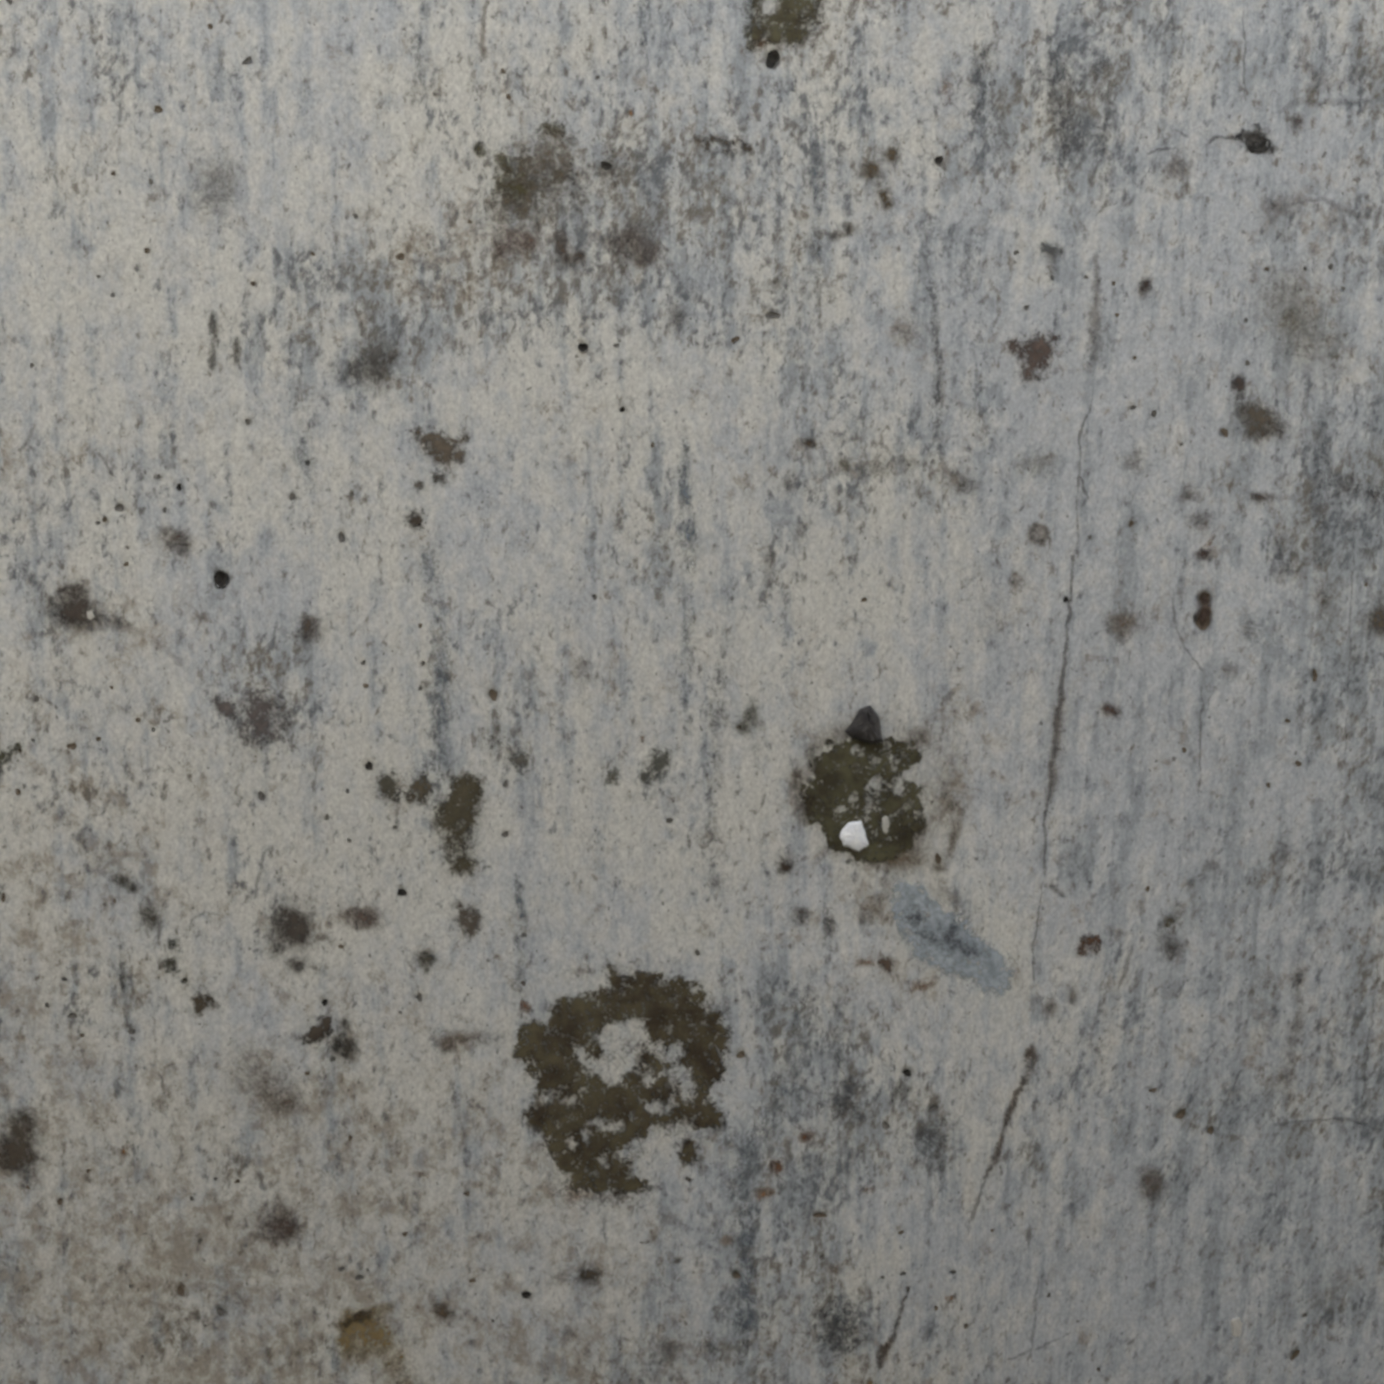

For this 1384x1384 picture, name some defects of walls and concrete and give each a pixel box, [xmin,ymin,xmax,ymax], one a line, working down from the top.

water stain [484,131,633,264]
water stain [609,225,660,264]
water stain [378,664,490,876]
water stain [867,783,962,871]
crack [983,1045,1037,1178]
crack [876,1295,907,1369]